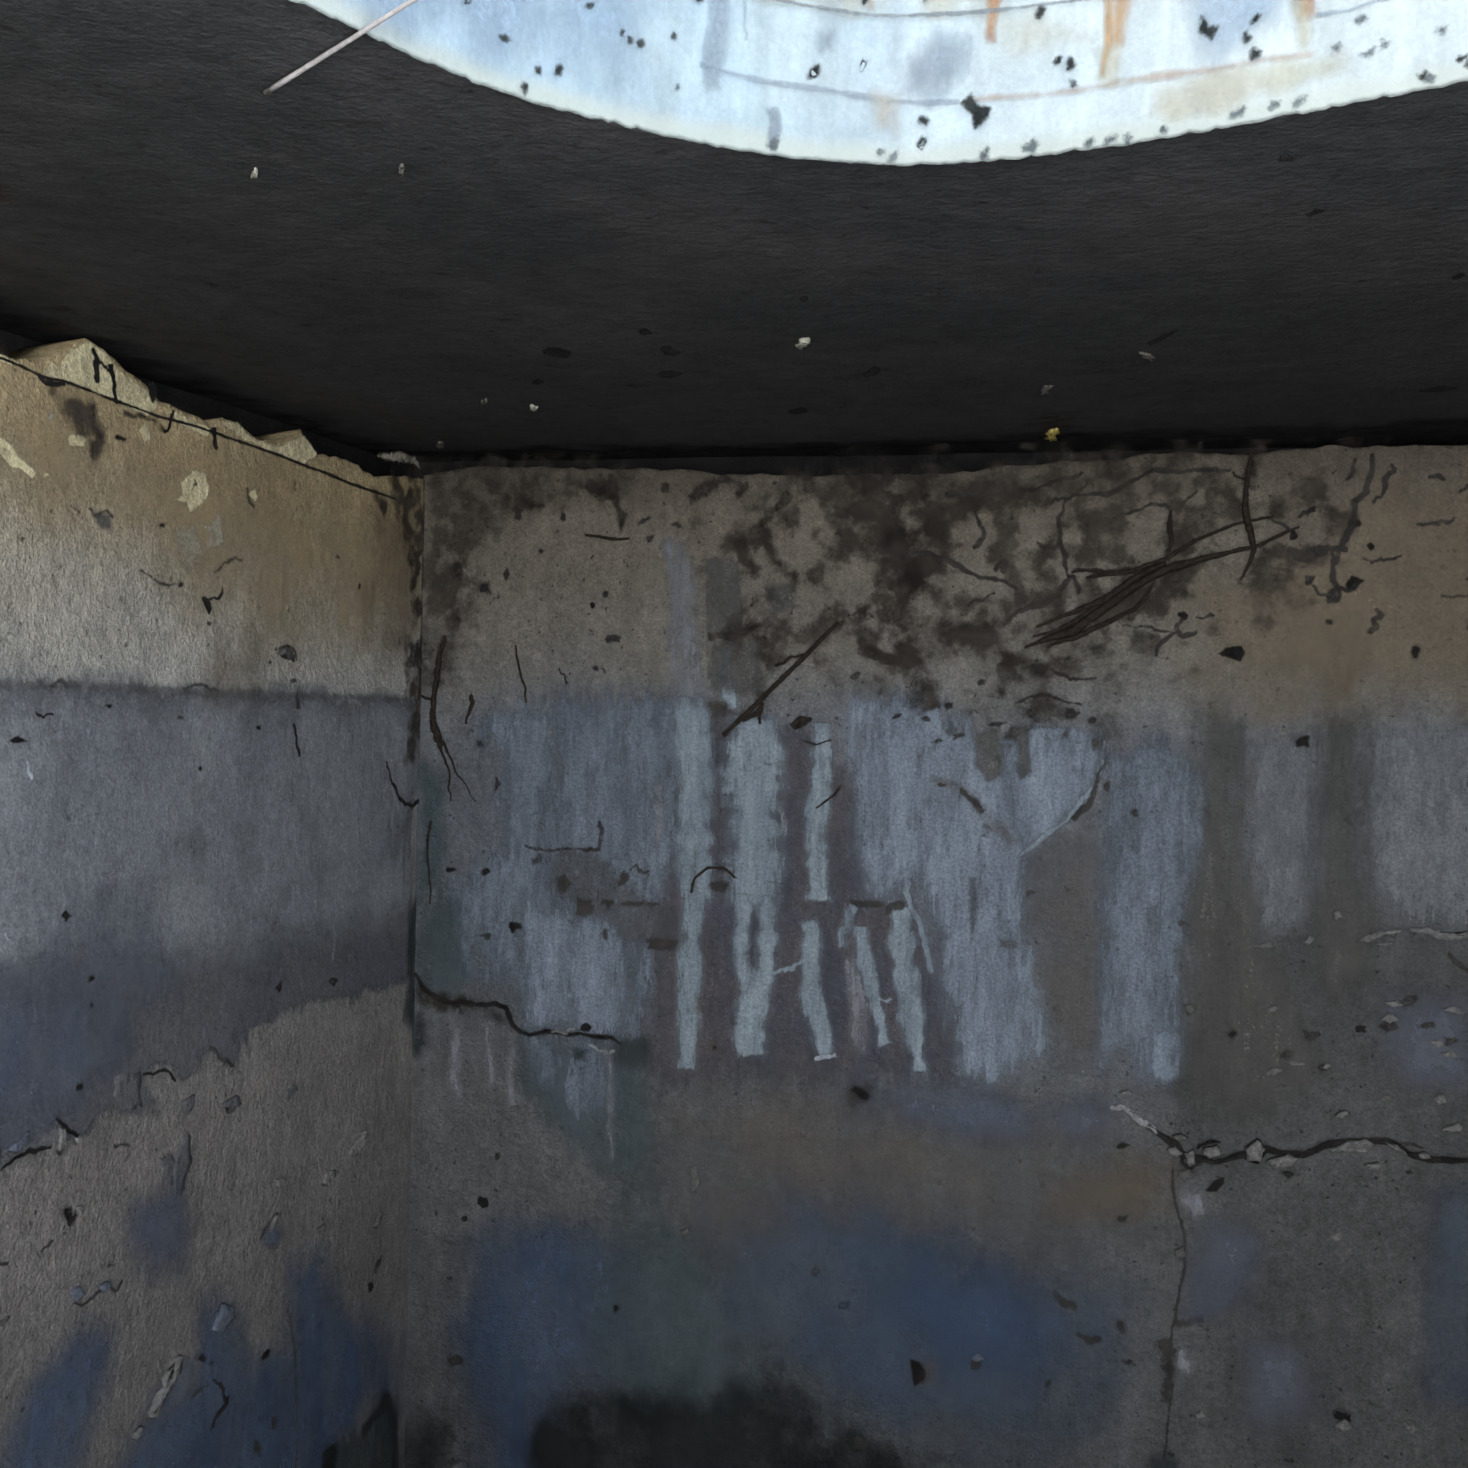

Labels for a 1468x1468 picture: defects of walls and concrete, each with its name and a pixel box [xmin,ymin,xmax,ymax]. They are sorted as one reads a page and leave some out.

rust [988,0,1000,37]
rust [1103,0,1124,67]
peeling [0,437,49,479]
flaking render [33,341,317,464]
crack [876,467,1232,626]
damp [1214,478,1468,680]
crack [1268,453,1468,634]
damp [485,451,1249,1178]
peeling [0,644,416,1199]
damp [1150,710,1313,1113]
crack [414,973,622,1055]
crack [1110,1104,1468,1459]